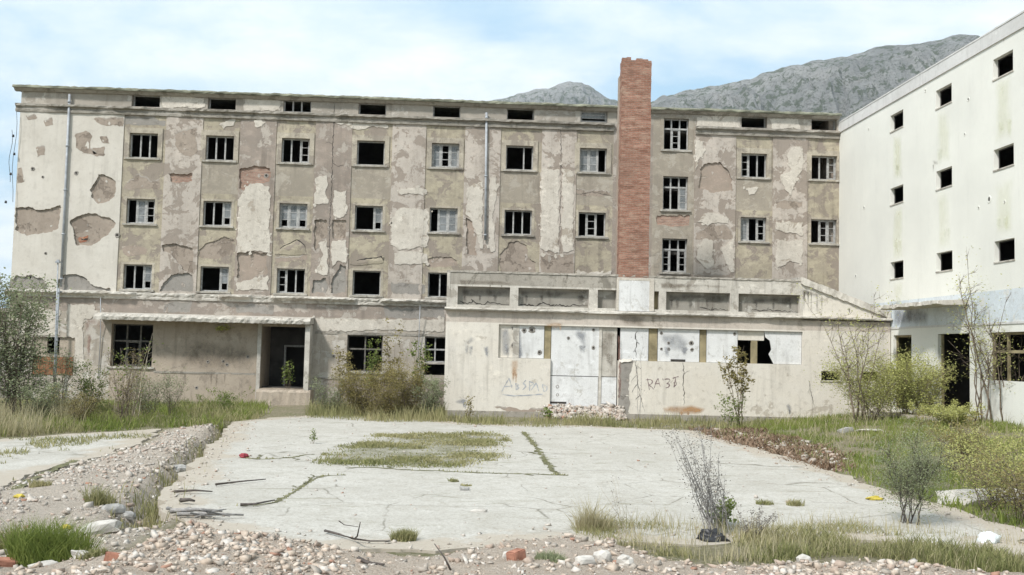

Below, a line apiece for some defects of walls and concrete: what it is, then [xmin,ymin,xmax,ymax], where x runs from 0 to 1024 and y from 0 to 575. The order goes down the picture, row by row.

spalling [14,174,120,246]